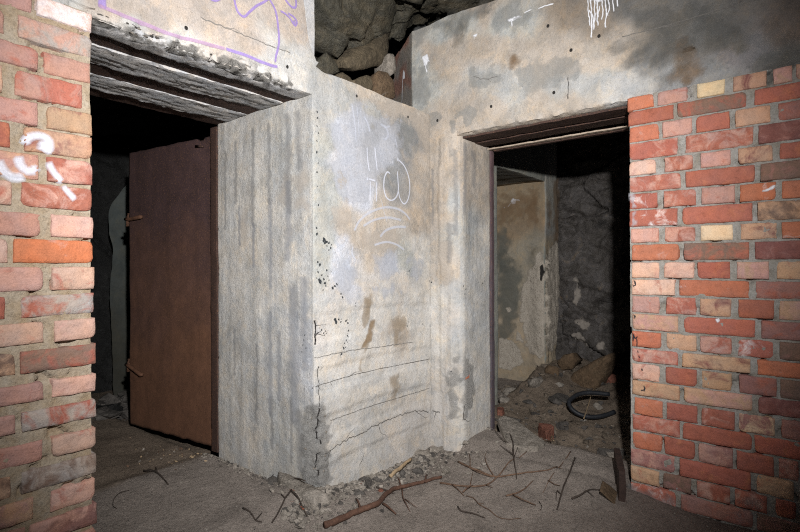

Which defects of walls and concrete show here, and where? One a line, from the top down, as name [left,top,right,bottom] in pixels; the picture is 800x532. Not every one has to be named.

spalling [121,22,293,88]
spalling [499,241,560,370]
crack [312,320,440,461]